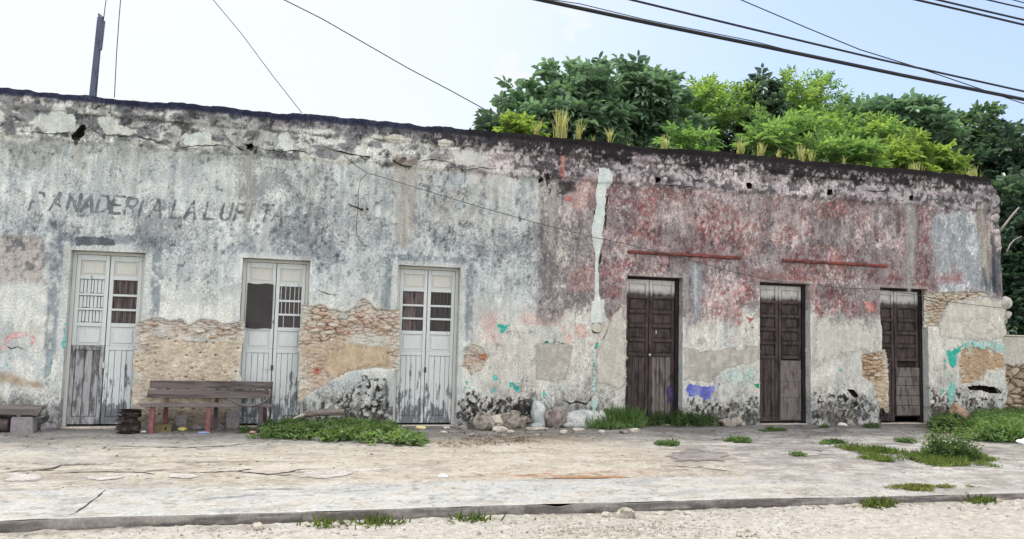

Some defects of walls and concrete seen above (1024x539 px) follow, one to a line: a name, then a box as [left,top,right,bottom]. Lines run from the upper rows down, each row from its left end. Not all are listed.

crack [11,116,234,148]
crack [260,147,389,160]
flaking render [923,292,988,328]
flaking render [131,318,245,429]
flaking render [297,299,400,403]
flaking render [461,321,520,393]
leakage [455,390,533,425]
leakage [814,392,878,425]
flaking render [861,349,889,413]
flaking render [941,340,1006,406]